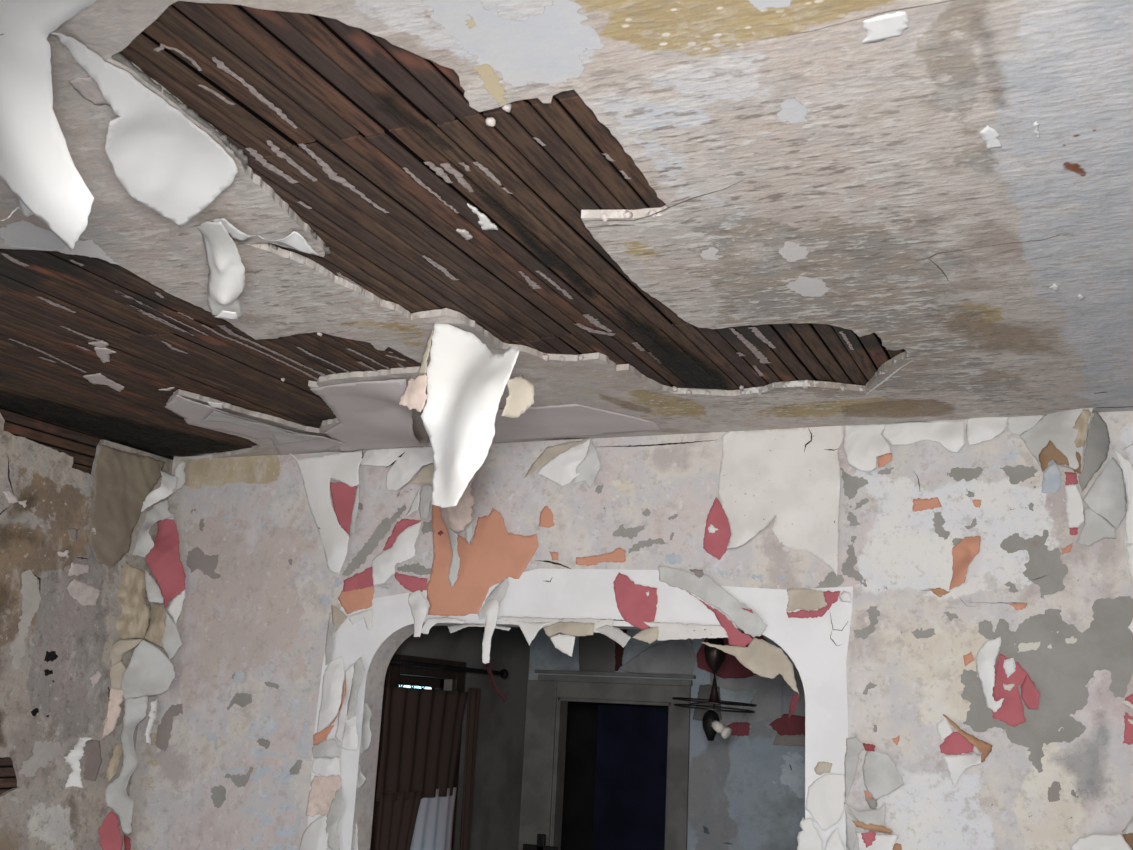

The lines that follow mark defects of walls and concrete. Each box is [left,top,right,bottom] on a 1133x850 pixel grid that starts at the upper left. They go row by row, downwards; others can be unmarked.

crack [786,0,955,36]
spalling [111,0,909,397]
rust [1064,162,1085,176]
spalling [0,220,421,454]
spalling [0,409,109,475]
water stain [9,497,34,515]
spalling [815,467,894,588]
spalling [932,511,977,545]
spalling [947,467,983,497]
spalling [1000,465,1037,488]
water stain [8,569,41,677]
spalling [960,530,1133,773]